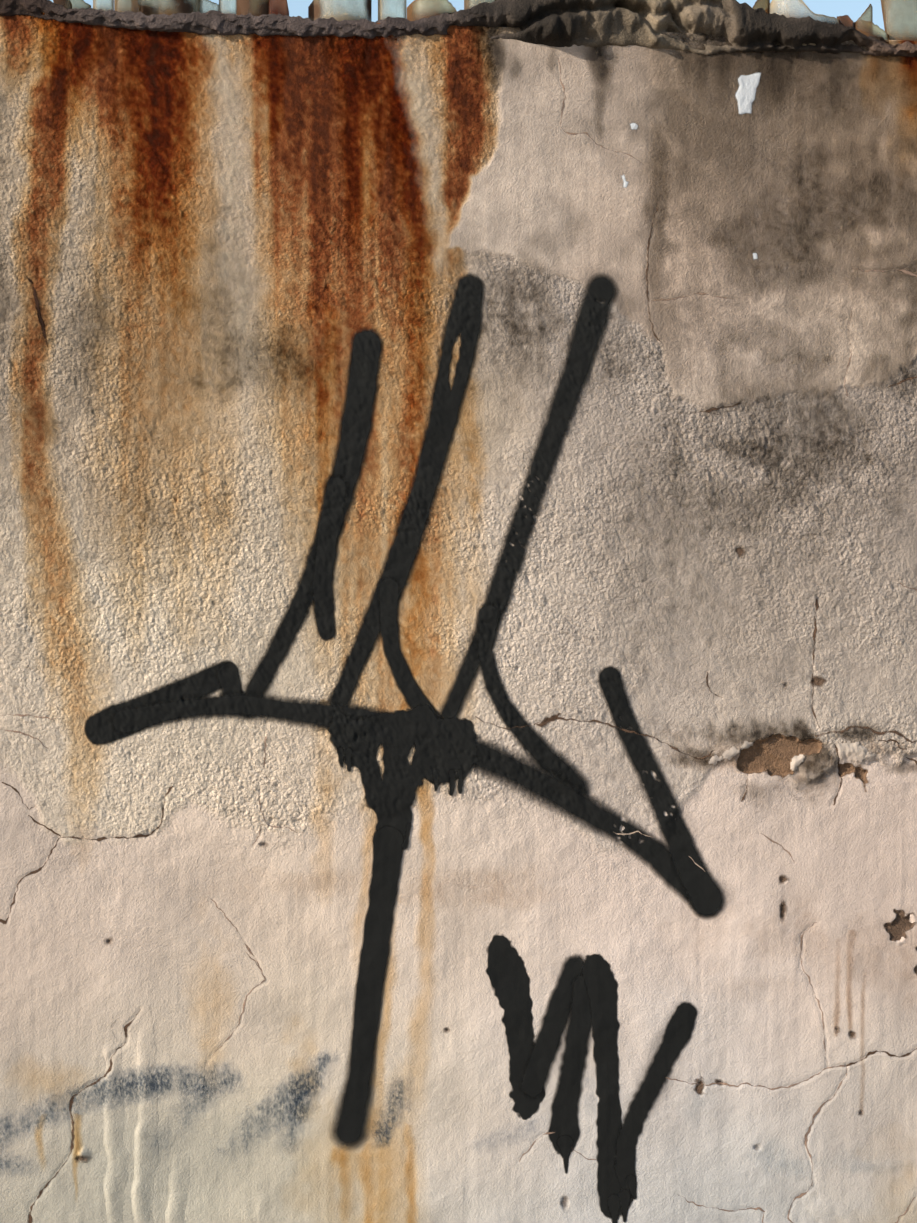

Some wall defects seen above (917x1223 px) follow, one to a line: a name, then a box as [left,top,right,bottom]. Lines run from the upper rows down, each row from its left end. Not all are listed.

rust [34,22,196,202]
rust [253,23,423,339]
rust [446,25,483,205]
crack [0,782,173,924]
crack [211,899,266,1050]
crack [475,713,714,759]
peeling [709,734,874,792]
crack [812,598,917,805]
spalling [884,909,917,949]
crack [28,1009,141,1223]
crack [665,922,917,1223]